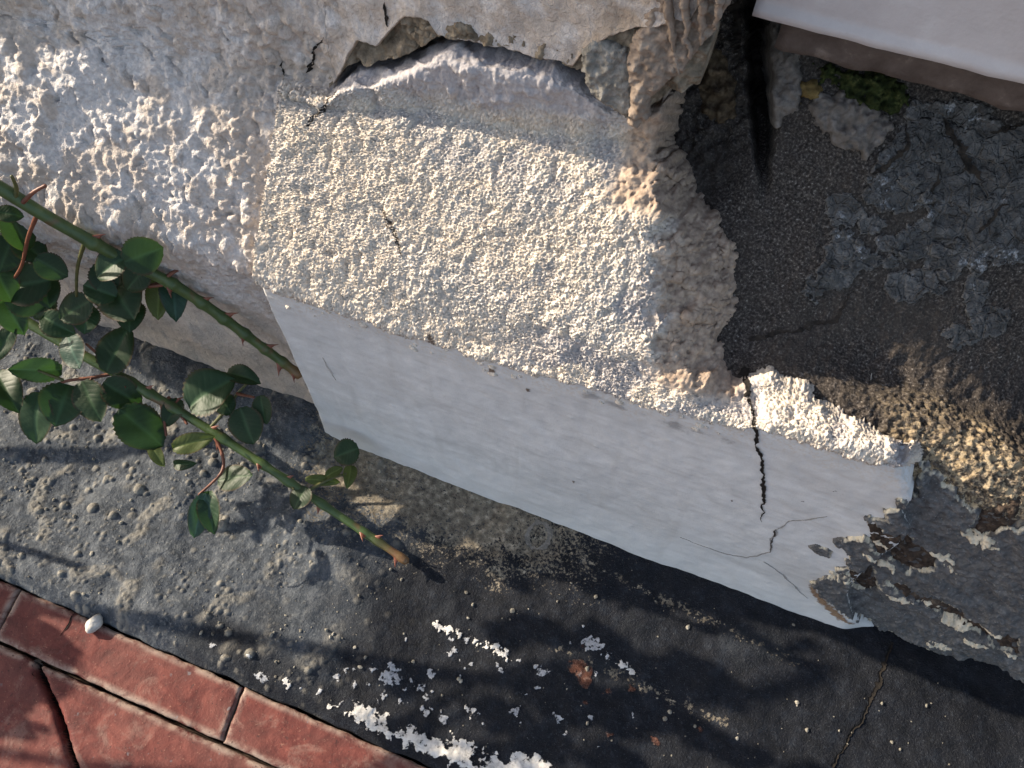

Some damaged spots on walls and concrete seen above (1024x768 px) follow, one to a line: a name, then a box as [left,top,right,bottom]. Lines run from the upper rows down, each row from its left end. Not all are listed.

crack [280,37,324,76]
crack [303,93,335,128]
crack [382,2,390,27]
flaking render [328,17,638,118]
flaking render [650,21,721,106]
peeling [794,90,1024,352]
crack [680,367,827,597]
peeling [808,451,1024,683]
crack [831,641,894,768]